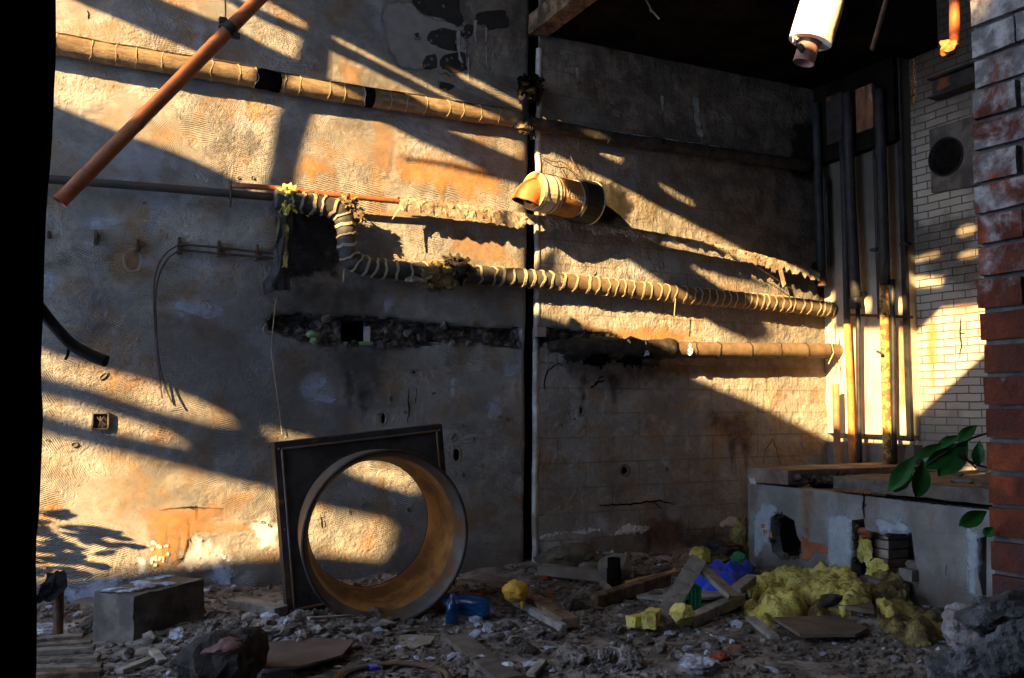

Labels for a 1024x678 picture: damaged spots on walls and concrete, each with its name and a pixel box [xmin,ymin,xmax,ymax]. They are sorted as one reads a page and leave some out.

peeling [412,0,509,91]
corrosion [148,509,217,562]
crack [599,500,675,509]
peeling [800,515,852,568]
peeling [876,518,908,533]
spalling [899,560,919,582]